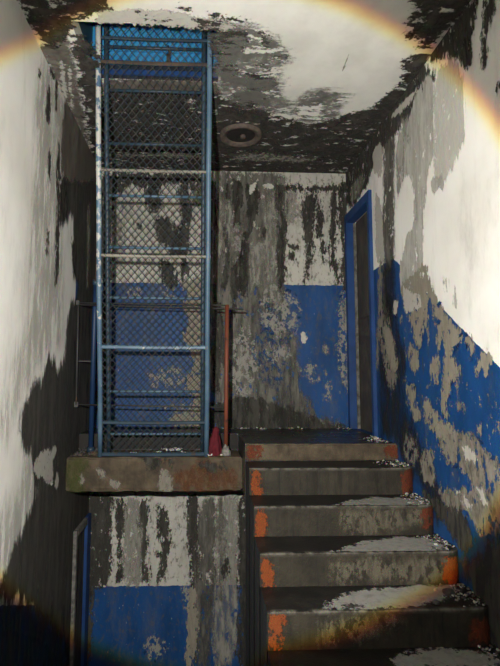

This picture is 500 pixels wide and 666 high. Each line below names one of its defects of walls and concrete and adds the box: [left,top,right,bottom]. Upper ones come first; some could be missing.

water stain [101,0,496,428]
water stain [0,0,174,666]
peeling [258,282,308,366]
peeling [293,362,333,399]
peeling [322,291,348,390]
flaking render [376,260,500,585]
peeling [143,633,166,663]
peeling [181,583,200,666]
water stain [183,492,246,666]